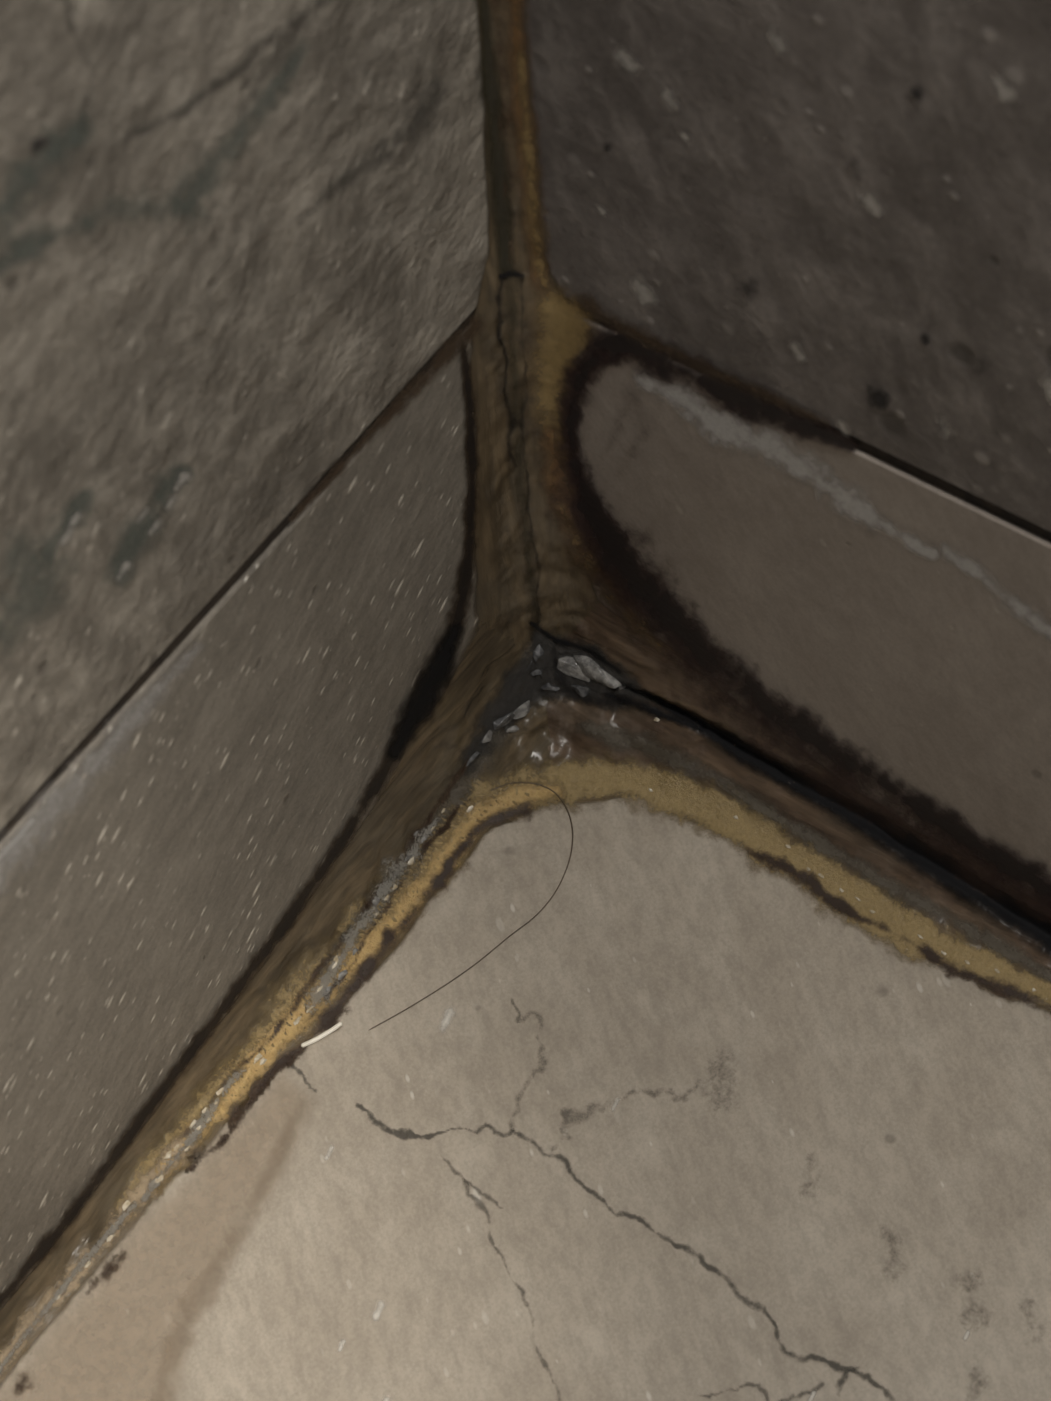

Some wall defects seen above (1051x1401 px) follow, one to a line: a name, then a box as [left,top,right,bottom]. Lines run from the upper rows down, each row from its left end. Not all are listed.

peeling [467,644,625,767]
water stain [529,327,1051,919]
crack [290,1062,316,1091]
crack [356,1097,892,1401]